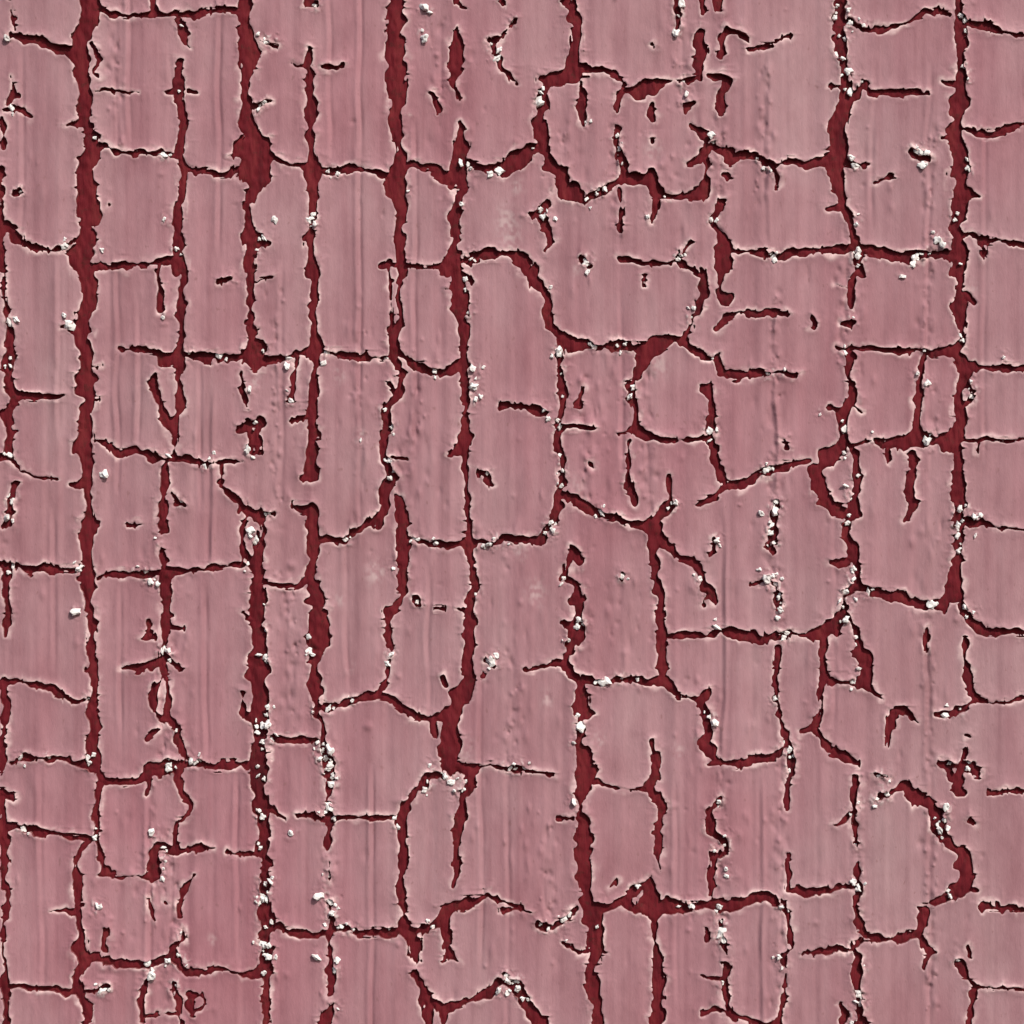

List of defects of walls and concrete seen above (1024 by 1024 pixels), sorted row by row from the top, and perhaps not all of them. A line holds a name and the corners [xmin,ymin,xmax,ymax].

peeling [699,0,723,16]
peeling [428,92,443,115]
peeling [646,102,656,123]
peeling [682,90,696,115]
peeling [908,144,931,169]
peeling [578,255,593,276]
peeling [573,386,585,409]
peeling [476,468,494,488]
crack [0,0,555,1024]
crack [439,0,1024,1024]
peeling [707,536,721,557]
peeling [412,595,447,612]